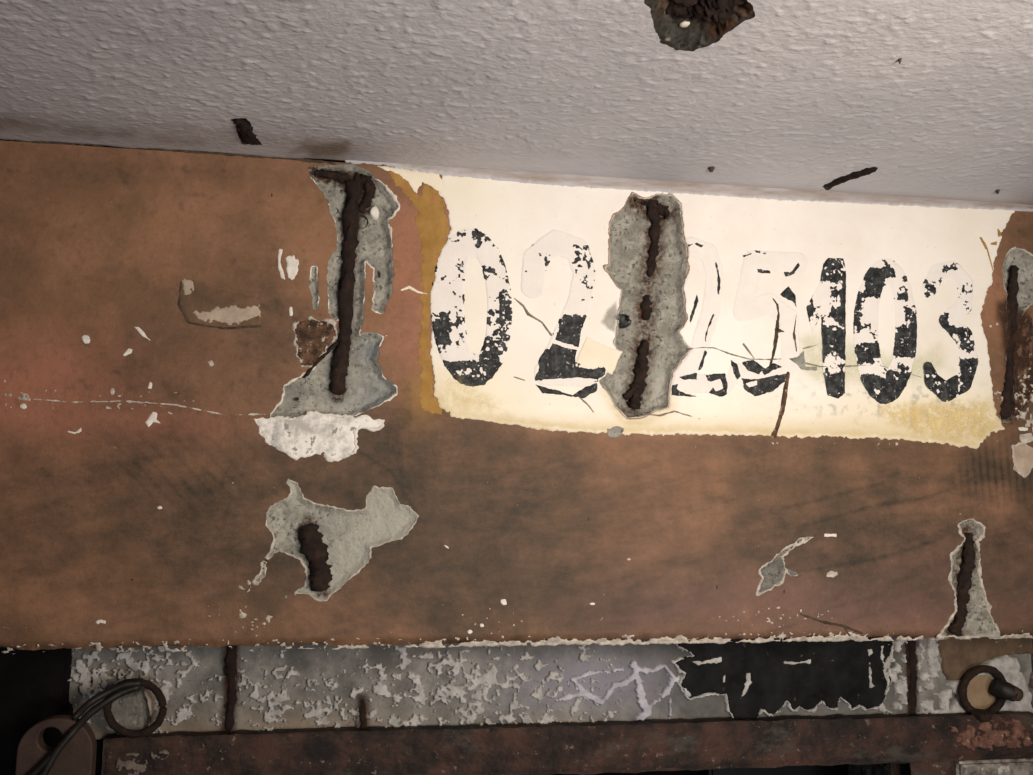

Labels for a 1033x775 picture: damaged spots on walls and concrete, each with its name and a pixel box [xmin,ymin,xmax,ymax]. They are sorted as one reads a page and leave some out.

spalling [644,0,755,52]
peeling [178,279,262,329]
spalling [254,162,400,462]
spalling [599,193,690,438]
spalling [989,247,1033,478]
spalling [239,478,419,602]
peeling [229,519,1033,731]
peeling [68,641,236,735]
peeling [116,749,169,775]